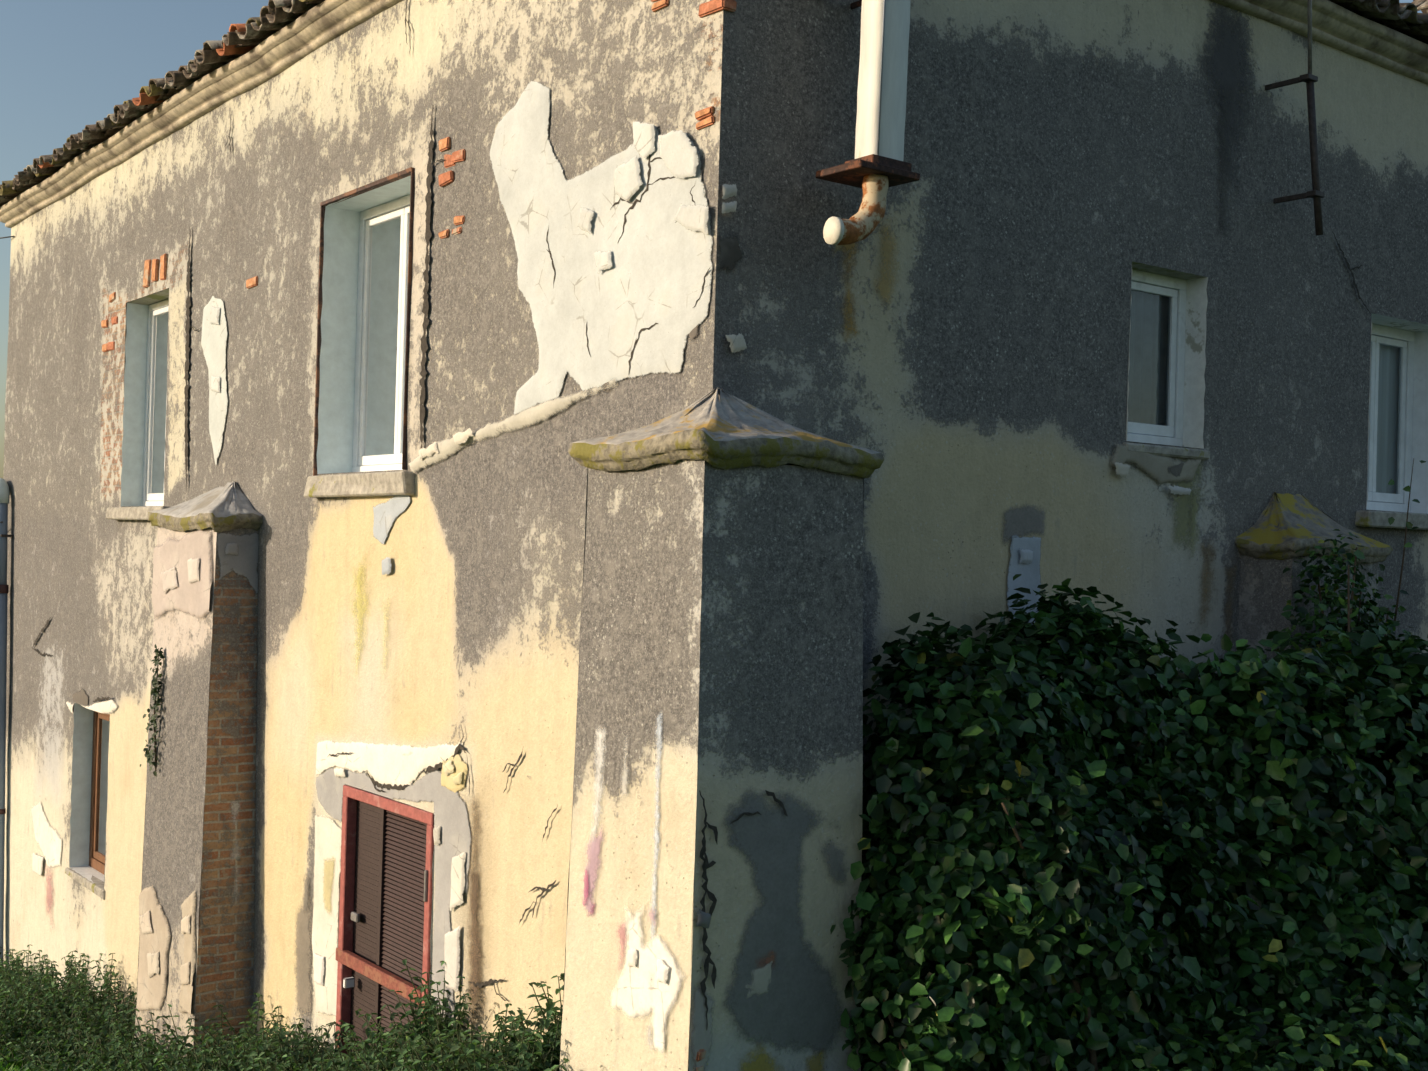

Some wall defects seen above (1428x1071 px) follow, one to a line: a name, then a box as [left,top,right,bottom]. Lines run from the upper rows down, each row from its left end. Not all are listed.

flaking render [698,0,737,18]
flaking render [438,137,466,187]
crack [611,154,712,242]
flaking render [143,254,168,288]
crack [546,227,556,288]
peeling [201,296,228,464]
crack [628,323,658,375]
spalling [152,530,212,618]
peeling [373,495,410,575]
spalling [312,754,471,1026]
crack [519,880,556,923]
crack [699,790,718,1031]